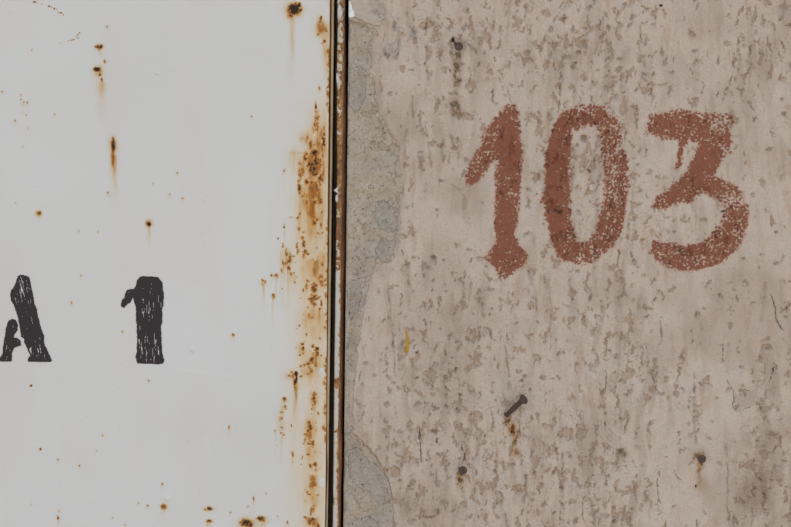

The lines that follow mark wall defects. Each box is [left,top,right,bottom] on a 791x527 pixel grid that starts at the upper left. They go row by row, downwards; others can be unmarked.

corrosion [288,2,302,17]
corrosion [262,104,328,283]
corrosion [302,264,328,328]
spalling [333,0,403,527]
corrosion [288,334,327,391]
corrosion [292,421,317,495]